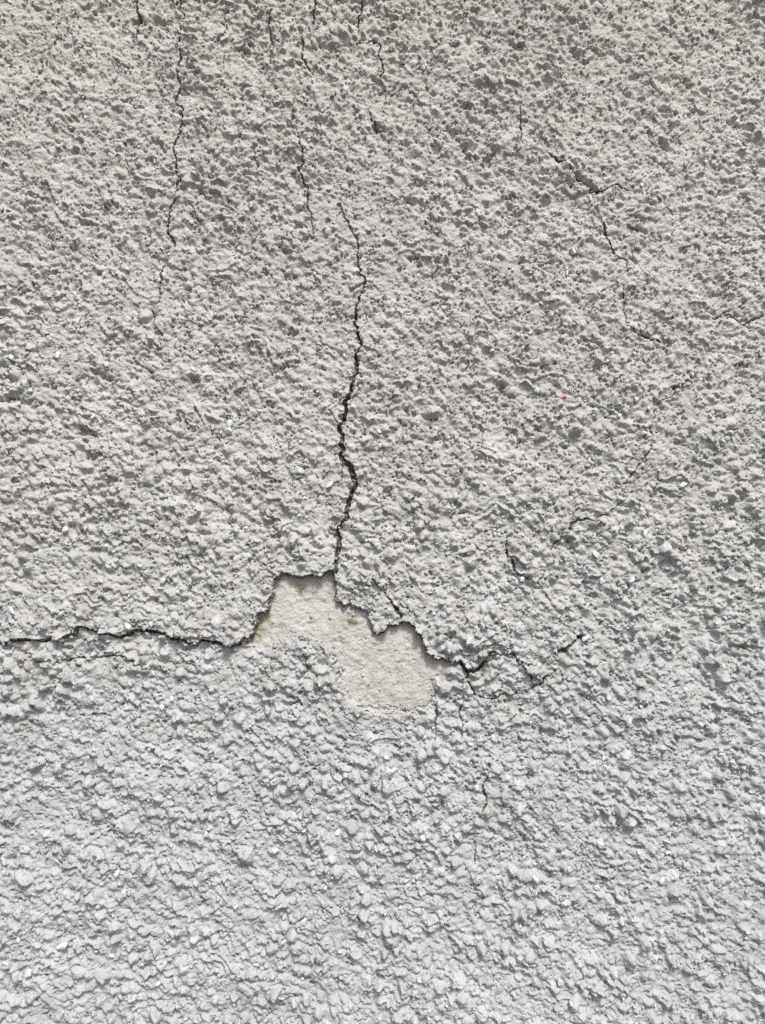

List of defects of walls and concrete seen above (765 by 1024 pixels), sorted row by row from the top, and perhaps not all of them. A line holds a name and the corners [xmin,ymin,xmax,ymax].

spalling [5,7,137,307]
crack [152,0,185,362]
spalling [157,0,762,244]
crack [546,150,660,342]
crack [319,202,367,574]
crack [1,624,255,670]
crack [372,579,402,619]
spalling [211,376,671,850]
crack [505,535,543,588]
spalling [658,662,753,795]